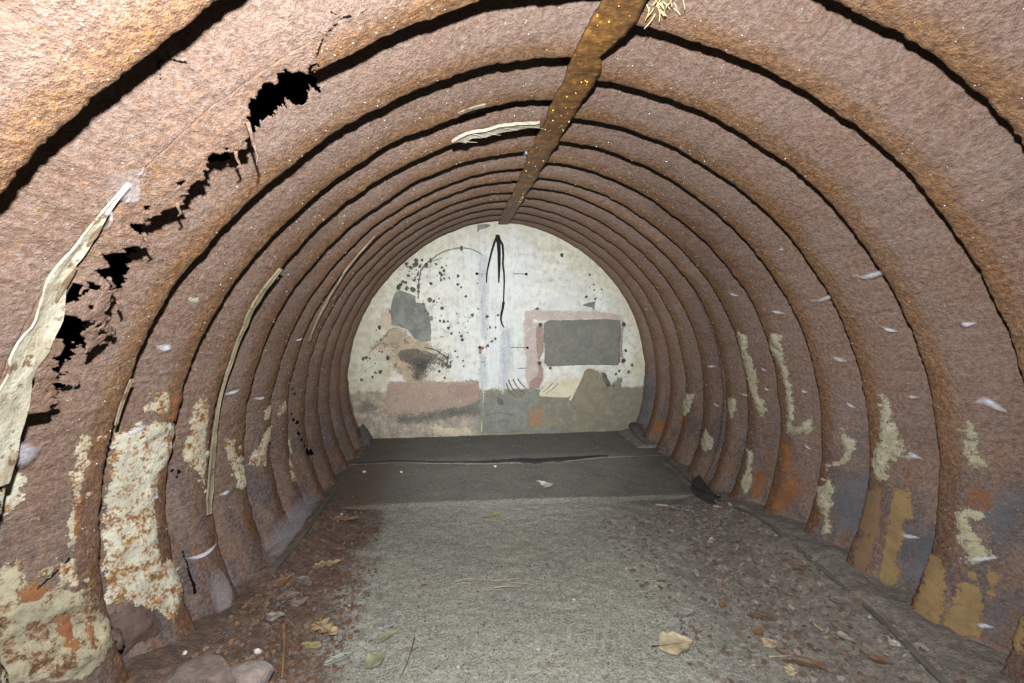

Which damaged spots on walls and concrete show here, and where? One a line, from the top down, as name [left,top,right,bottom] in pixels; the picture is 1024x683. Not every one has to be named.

peeling [245,121,259,166]
peeling [0,182,131,517]
peeling [0,268,287,683]
rust [746,441,807,514]